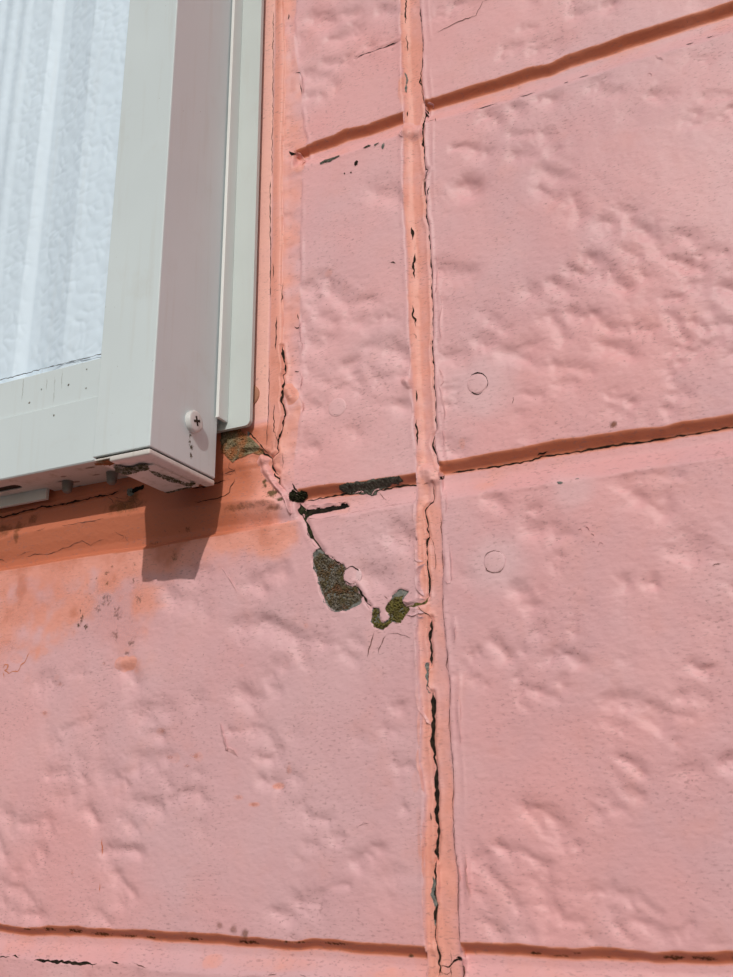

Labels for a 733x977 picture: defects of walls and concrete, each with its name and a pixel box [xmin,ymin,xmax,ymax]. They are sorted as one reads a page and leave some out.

crack [0,491,136,561]
peeling [305,476,403,518]
crack [298,0,733,977]
crack [0,955,145,968]